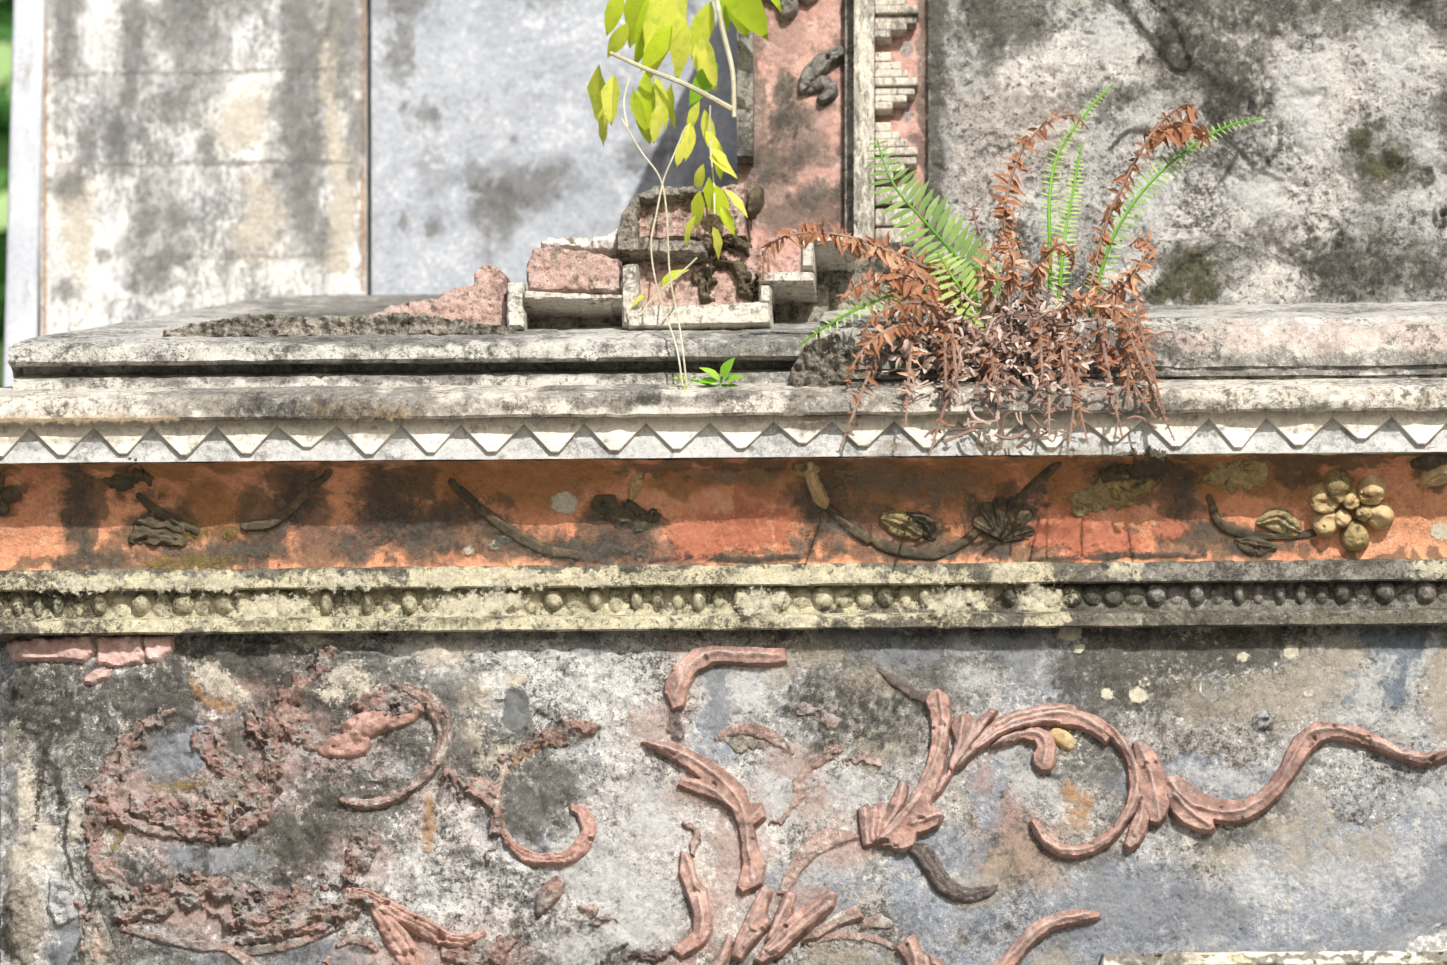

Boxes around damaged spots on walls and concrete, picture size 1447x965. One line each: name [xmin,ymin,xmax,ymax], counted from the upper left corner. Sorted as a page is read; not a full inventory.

damp [965,0,1053,76]
damp [923,0,947,202]
damp [1079,0,1344,164]
damp [48,0,440,301]
spalling [615,186,708,266]
damp [1121,171,1176,232]
damp [1221,178,1446,298]
peeling [7,635,254,712]
spalling [272,641,619,927]
spalling [158,840,269,876]
spalling [681,821,701,857]
spalling [266,937,369,965]